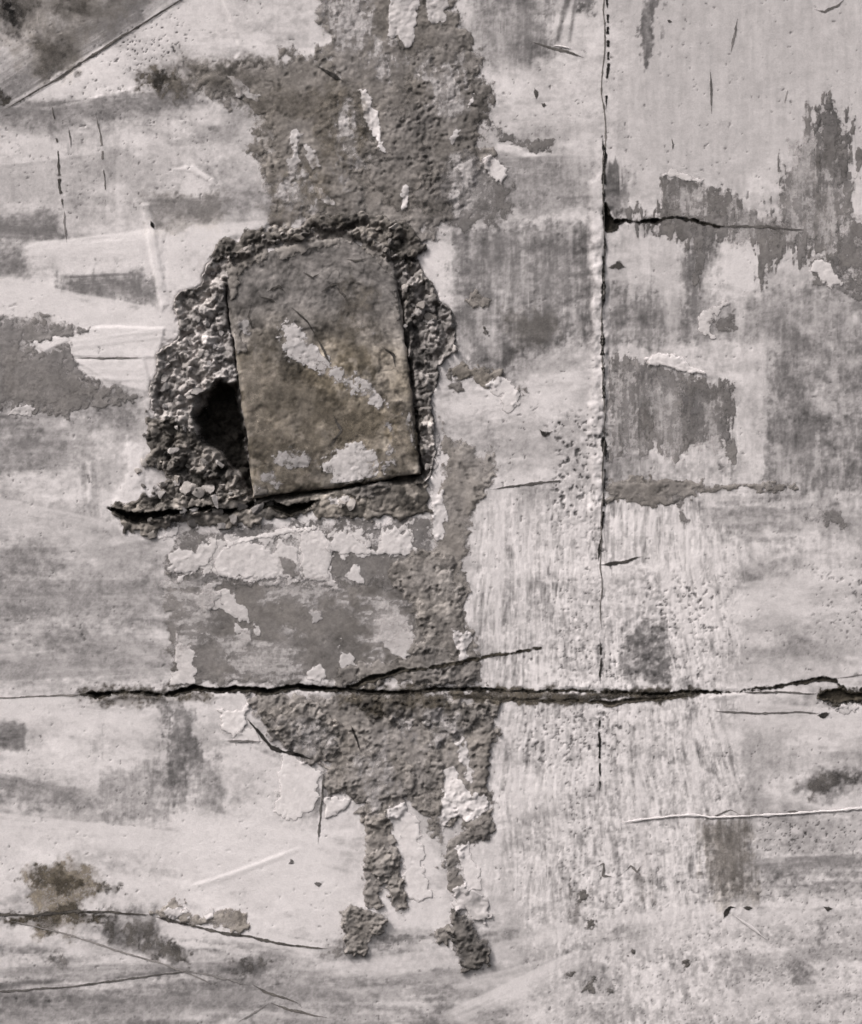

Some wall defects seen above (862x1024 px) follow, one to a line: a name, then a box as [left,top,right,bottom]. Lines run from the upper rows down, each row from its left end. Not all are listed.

peeling [0,0,555,687]
corrosion [243,357,415,490]
crack [0,0,862,790]
crack [228,720,324,838]
crack [0,909,327,1021]
spalling [149,897,250,934]